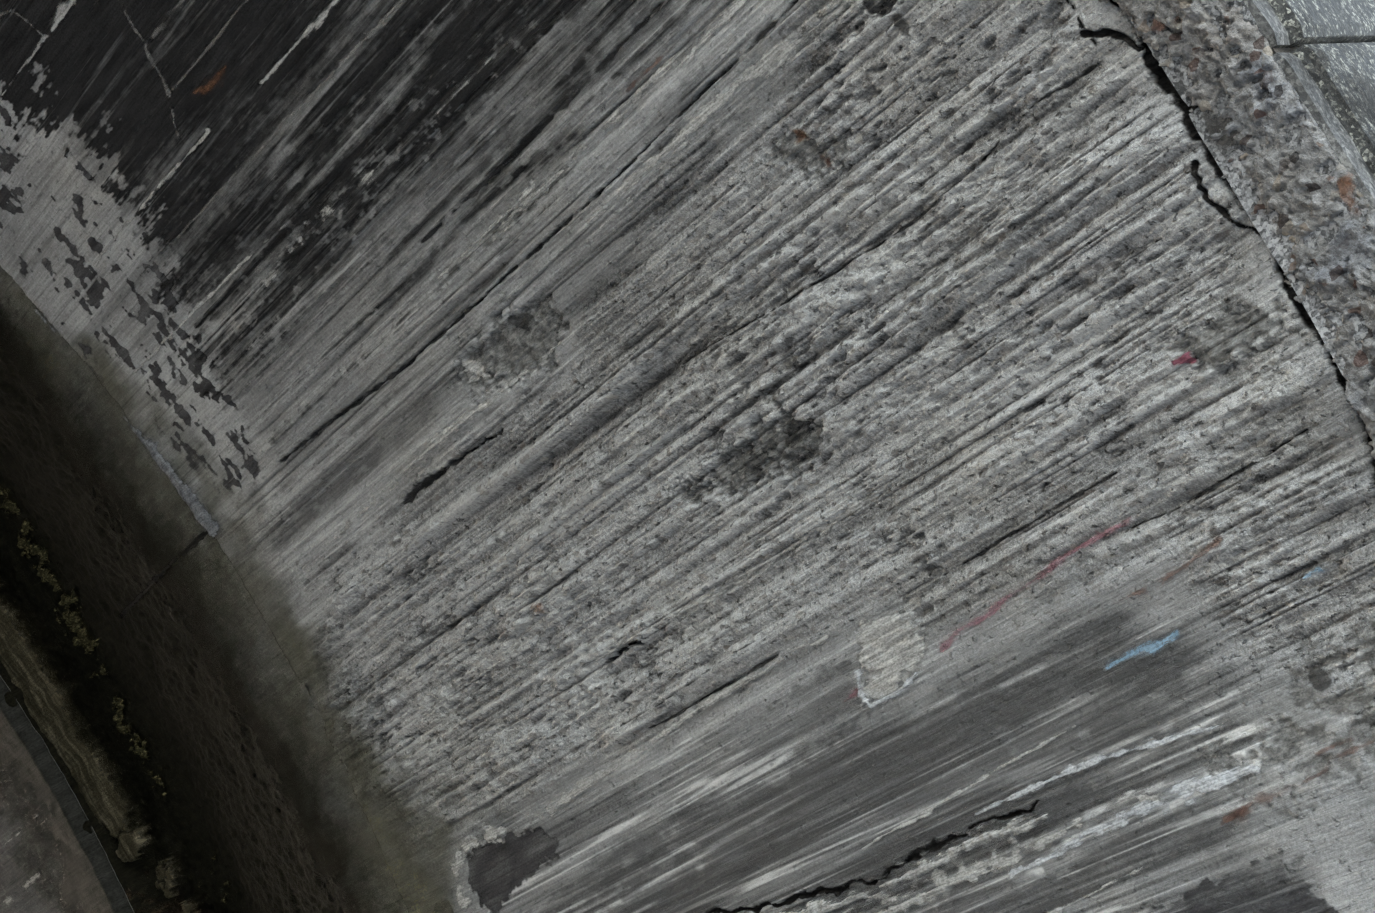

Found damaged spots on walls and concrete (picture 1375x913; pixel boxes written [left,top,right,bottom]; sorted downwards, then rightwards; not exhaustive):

crack [1066,0,1261,236]
crack [1278,265,1347,391]
peeling [123,416,219,538]
water stain [0,677,134,913]
peeling [449,810,545,913]
crack [707,800,1047,913]